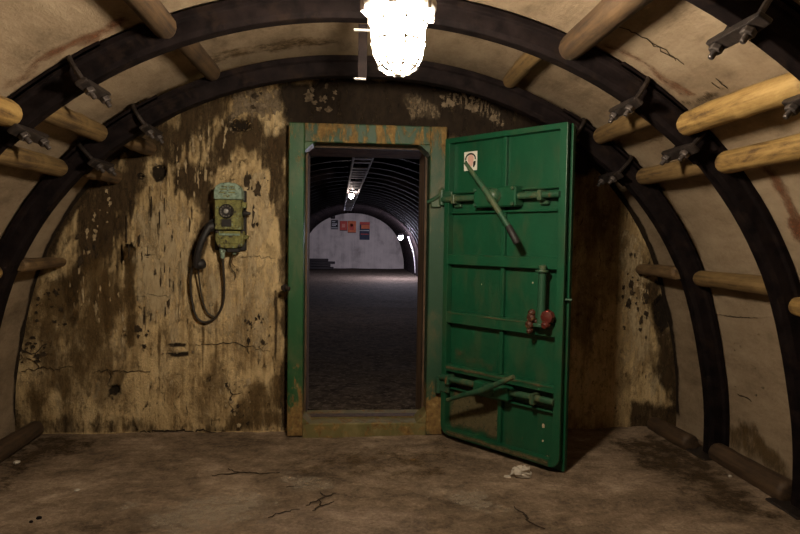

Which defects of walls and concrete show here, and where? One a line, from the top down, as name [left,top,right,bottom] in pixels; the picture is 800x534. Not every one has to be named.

crack [619,27,684,65]
peeling [303,83,337,112]
peeling [406,92,504,126]
leakage [575,147,658,265]
leakage [0,79,541,491]
crack [196,342,268,351]
leakage [611,277,785,518]
crack [212,468,336,518]
crack [514,506,545,529]